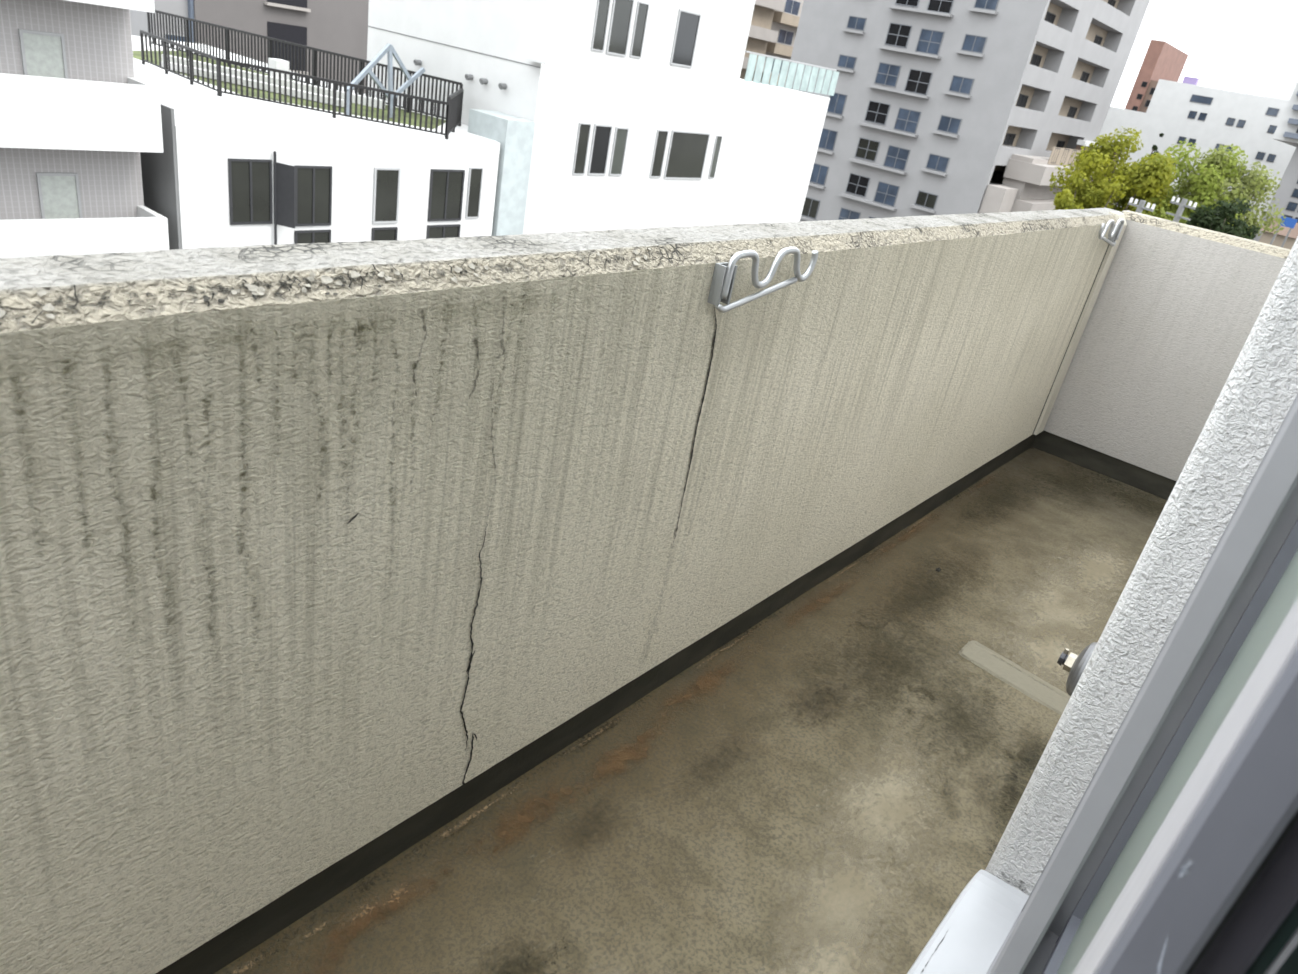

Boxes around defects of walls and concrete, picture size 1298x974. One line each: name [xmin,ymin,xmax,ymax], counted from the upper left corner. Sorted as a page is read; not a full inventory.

crack [469,298,504,397]
crack [674,307,717,536]
crack [460,523,487,785]
leakage [1006,545,1136,683]
leakage [778,746,934,974]